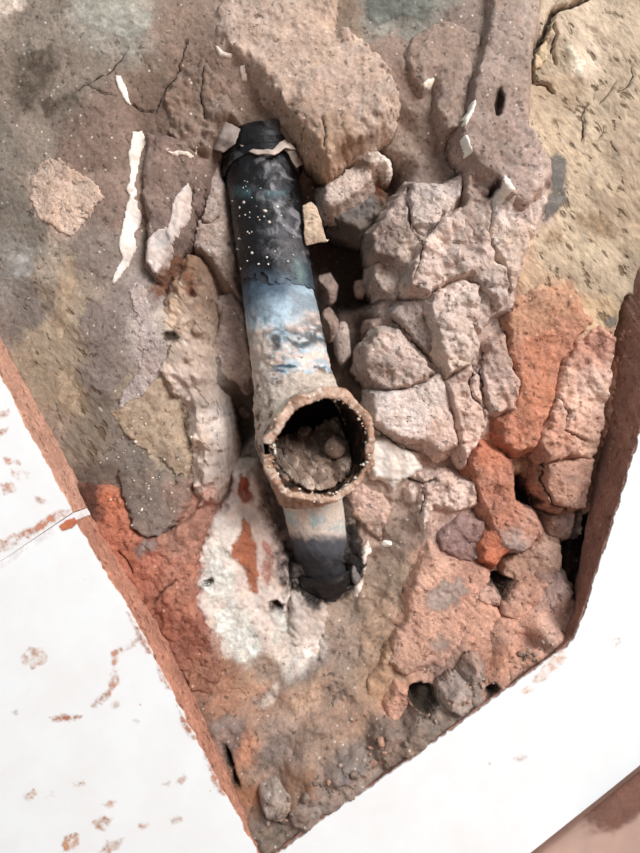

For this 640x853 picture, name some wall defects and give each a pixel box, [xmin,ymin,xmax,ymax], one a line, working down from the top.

crack [533,1,585,55]
flaking render [112,131,146,284]
flaking render [146,183,192,275]
crack [408,206,443,277]
crack [468,354,485,417]
spalling [490,285,619,465]
rust [238,474,252,503]
spalling [77,481,226,694]
damp [176,487,261,670]
rust [230,518,274,593]
damp [275,519,365,609]
damp [259,683,279,708]